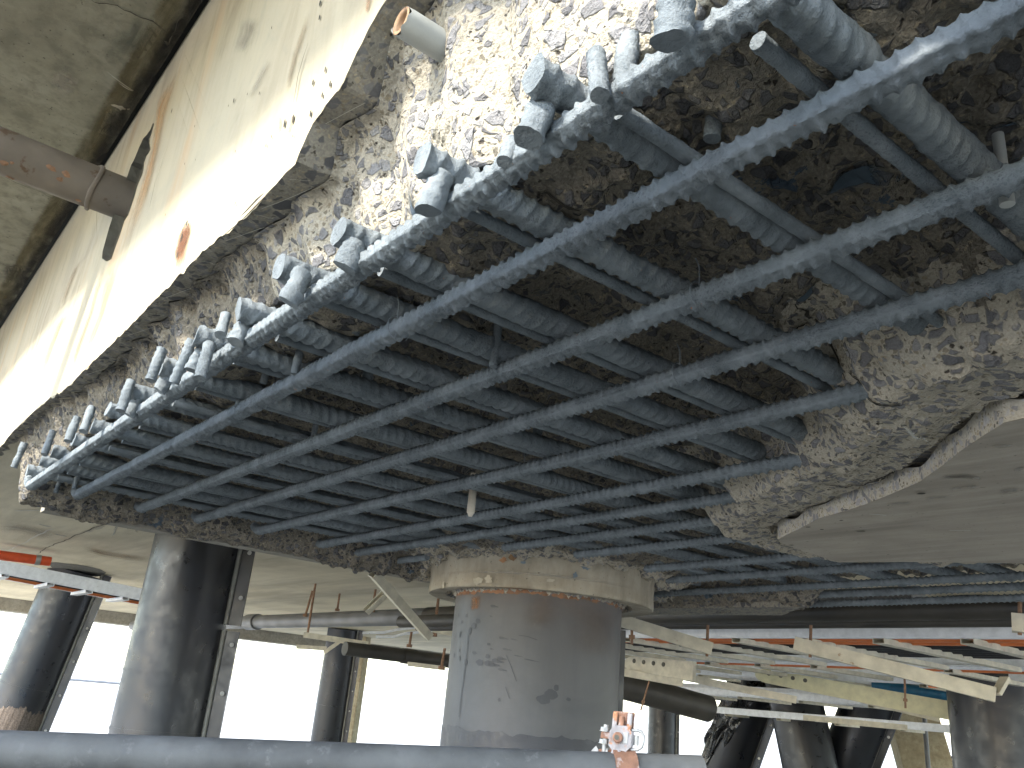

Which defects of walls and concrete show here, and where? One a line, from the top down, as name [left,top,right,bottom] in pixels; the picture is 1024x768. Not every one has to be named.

corrosion [175,217,190,264]
spalling [0,0,1024,614]